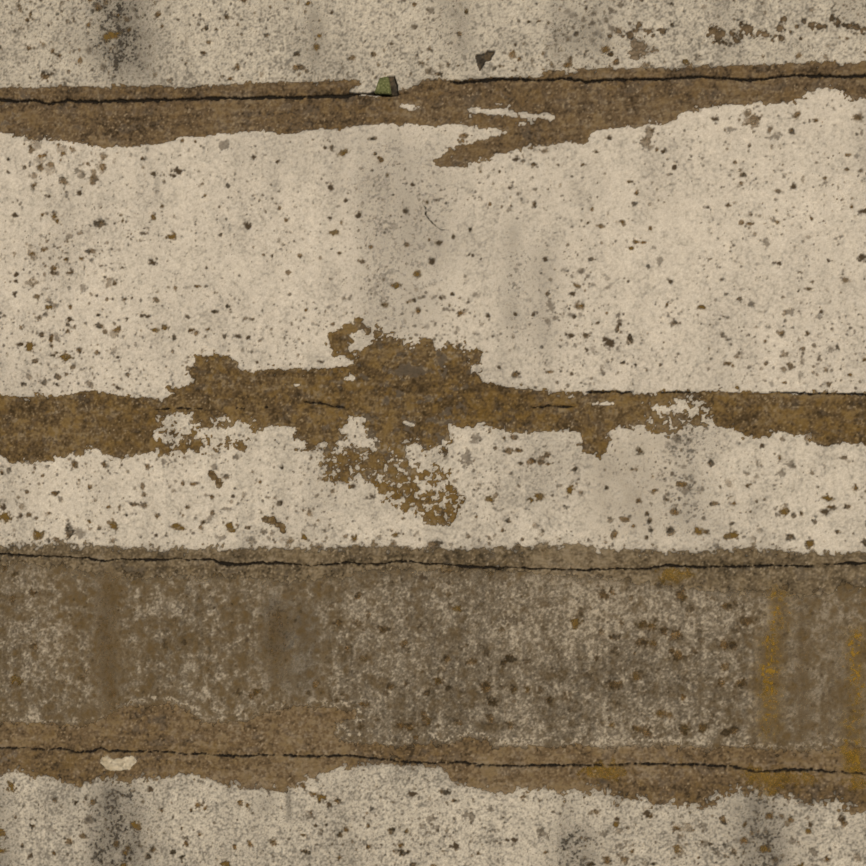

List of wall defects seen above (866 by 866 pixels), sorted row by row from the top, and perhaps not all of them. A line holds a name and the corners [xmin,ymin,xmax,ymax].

spalling [706,14,866,46]
crack [0,92,395,105]
peeling [0,22,866,168]
crack [450,74,866,85]
peeling [0,317,866,526]
peeling [0,516,866,599]
crack [0,553,866,571]
crack [0,747,863,775]
peeling [0,700,866,815]